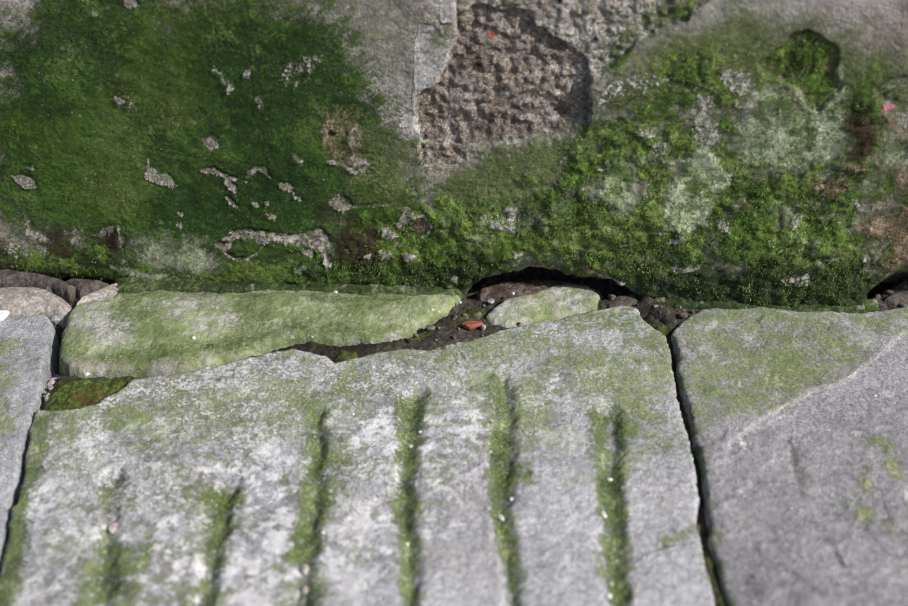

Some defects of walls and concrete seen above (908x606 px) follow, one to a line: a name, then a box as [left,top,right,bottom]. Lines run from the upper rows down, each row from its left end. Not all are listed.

spalling [399,0,712,192]